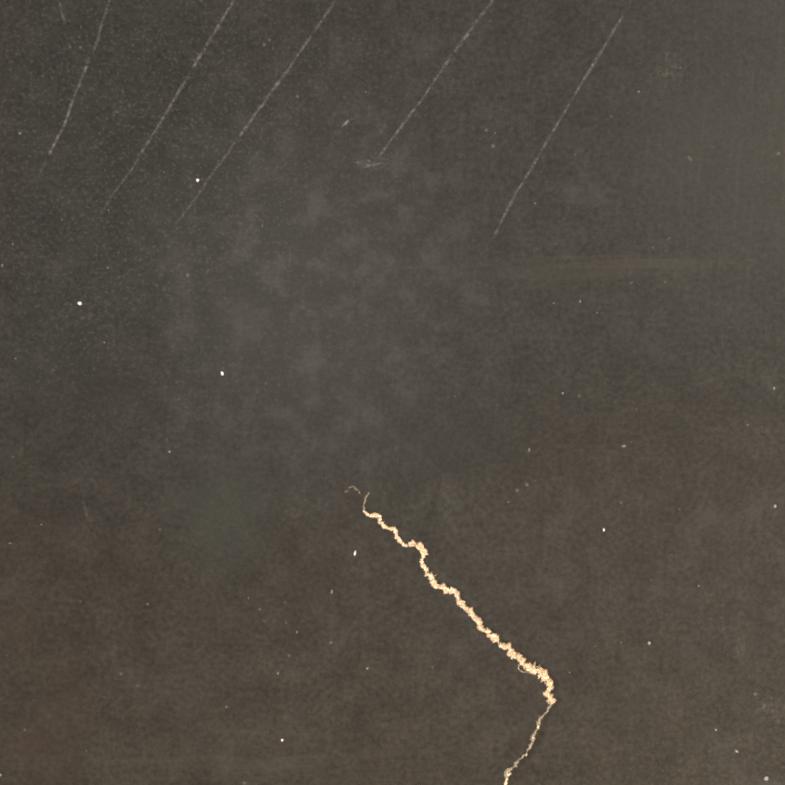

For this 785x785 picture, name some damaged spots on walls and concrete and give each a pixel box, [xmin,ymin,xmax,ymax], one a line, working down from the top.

crack [344,486,556,785]